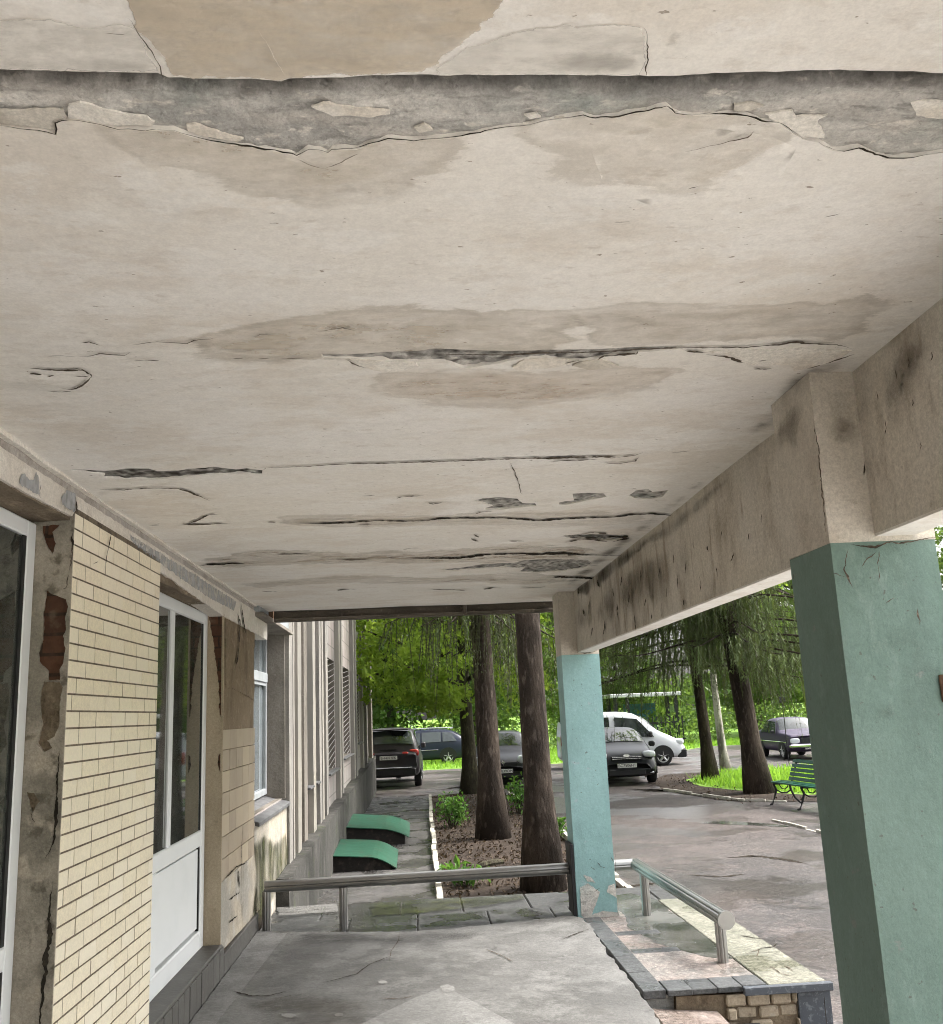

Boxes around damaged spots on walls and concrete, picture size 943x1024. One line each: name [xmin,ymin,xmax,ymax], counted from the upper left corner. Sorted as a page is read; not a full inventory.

flaking render [0,19,943,159]
crack [448,341,854,370]
flaking render [43,525,59,553]
crack [270,454,671,588]
flaking render [479,497,536,509]
damp [578,551,632,593]
crack [814,429,826,531]
crack [834,537,936,603]
flaking render [39,591,68,752]
peeling [580,875,619,918]
crack [39,886,53,1024]